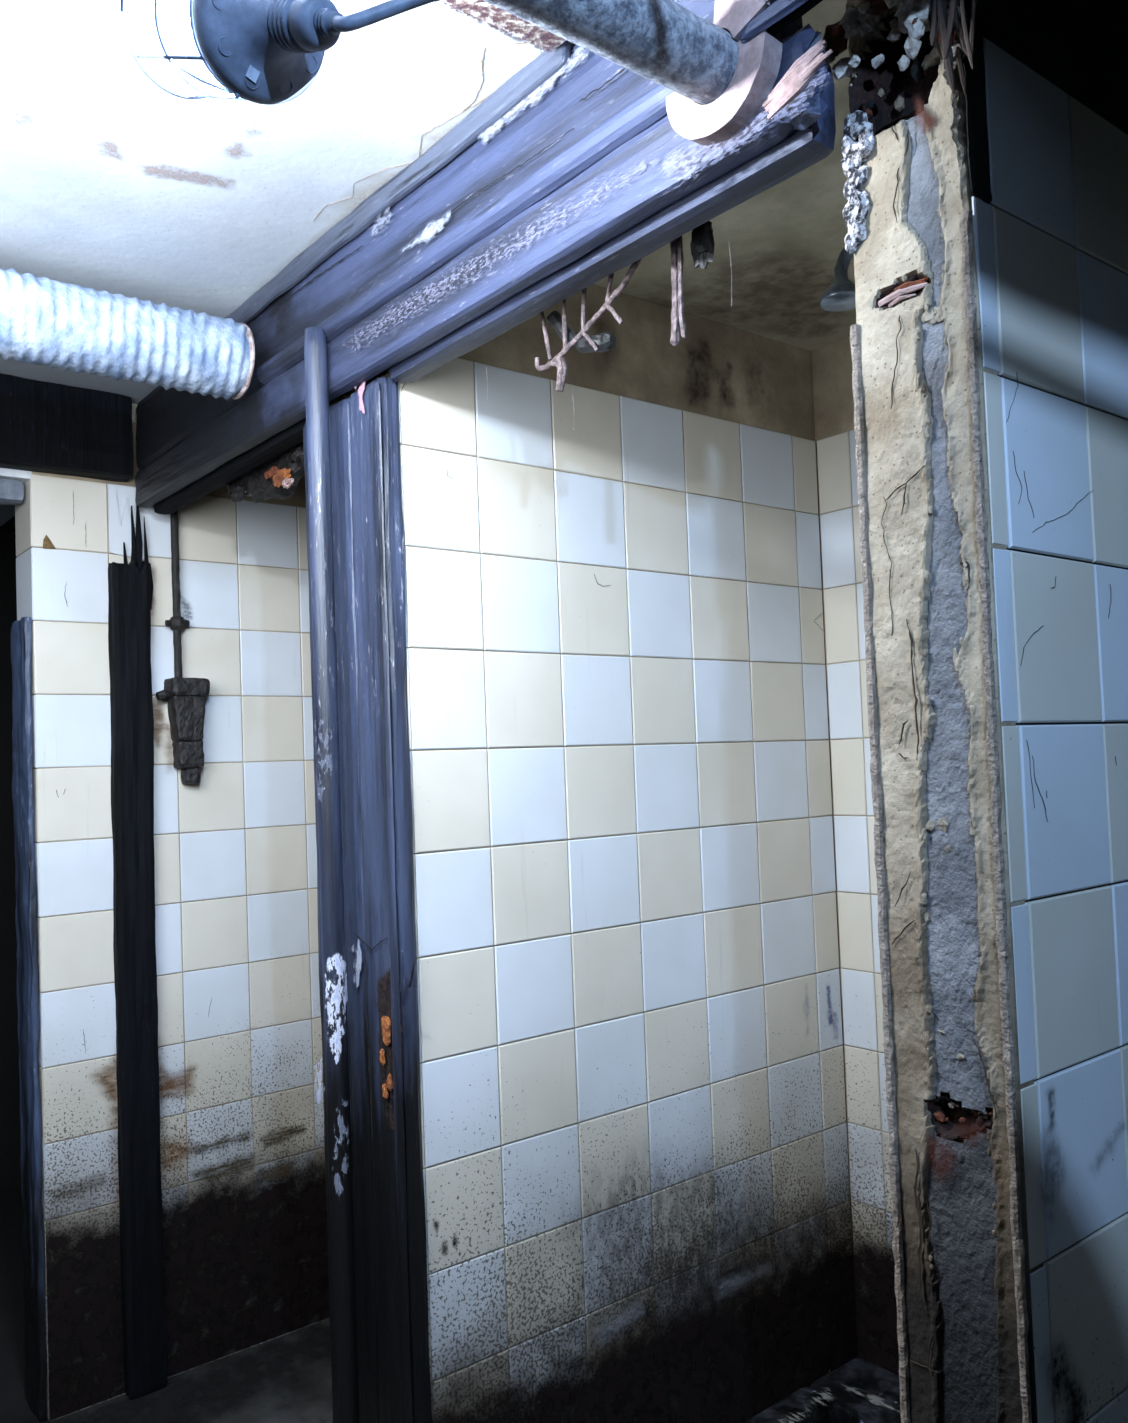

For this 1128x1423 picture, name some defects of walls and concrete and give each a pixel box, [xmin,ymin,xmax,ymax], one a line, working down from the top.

spalling [351,0,992,349]
crack [1006,372,1093,532]
crack [881,465,925,760]
spalling [841,88,998,1423]
peeling [315,939,362,1105]
water stain [41,1126,331,1423]
water stain [431,1209,901,1423]